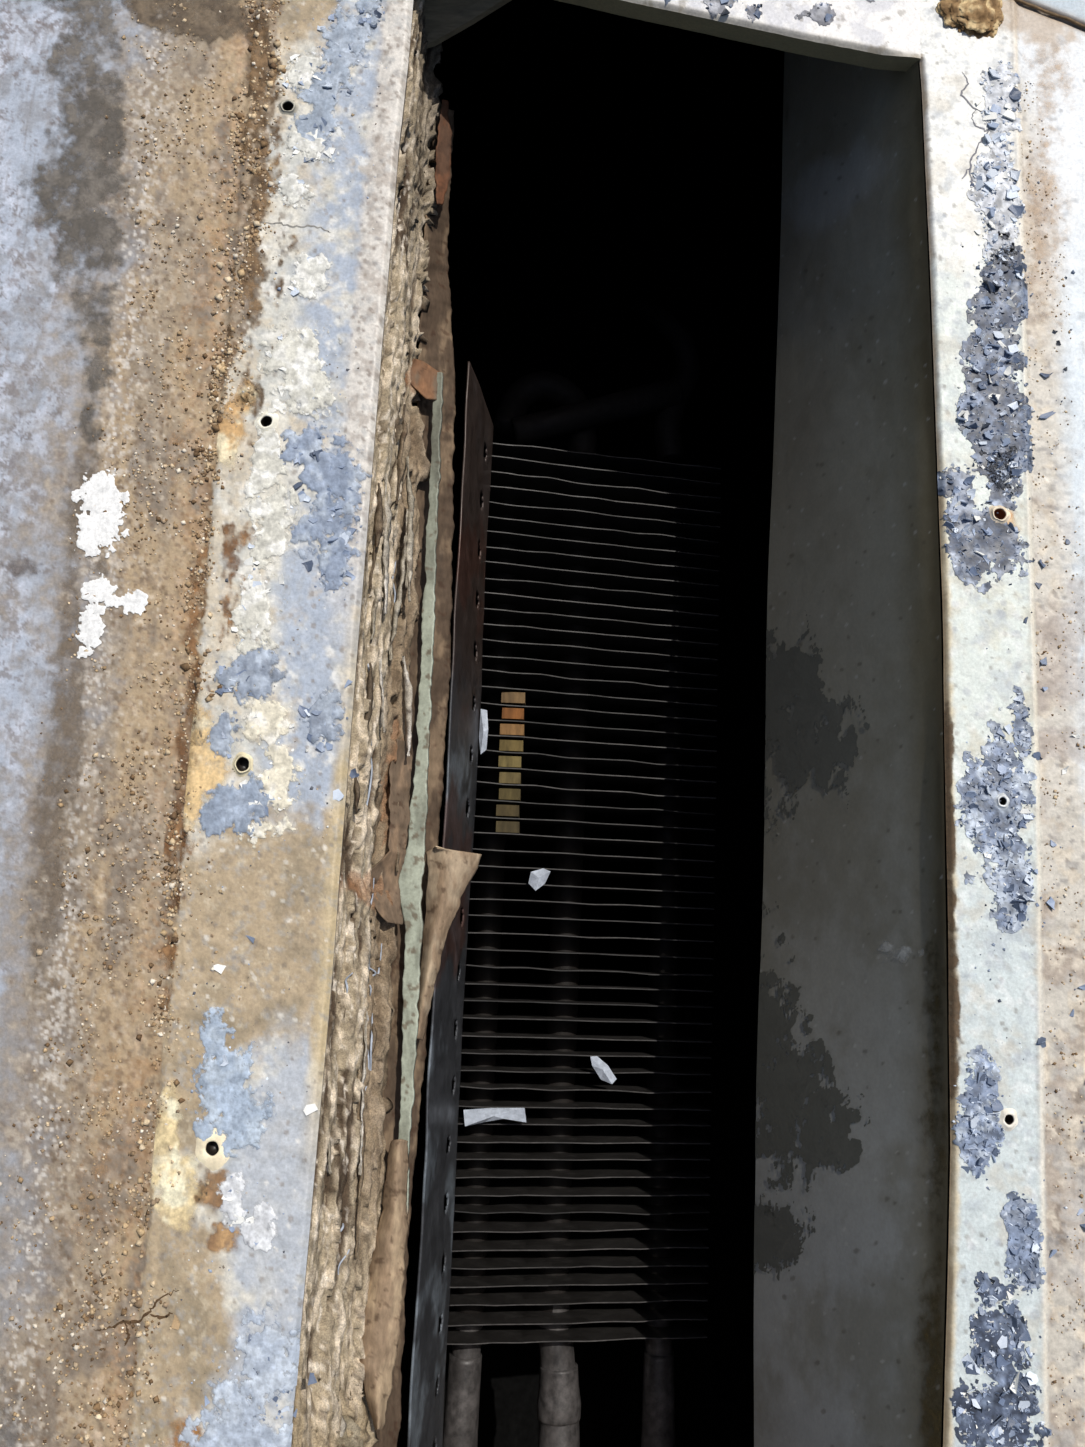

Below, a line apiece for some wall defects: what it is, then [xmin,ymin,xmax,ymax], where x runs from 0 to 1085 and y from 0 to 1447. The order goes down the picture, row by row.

corrosion [240,0,295,327]
corrosion [217,369,264,463]
peeling [937,60,1067,594]
corrosion [164,523,249,857]
peeling [198,316,373,848]
peeling [953,685,1055,934]
corrosion [151,1088,239,1252]
peeling [193,1007,278,1252]
peeling [951,1044,1005,1190]
crack [95,1290,179,1346]
corrosion [174,1421,202,1447]
peeling [950,1191,1057,1447]